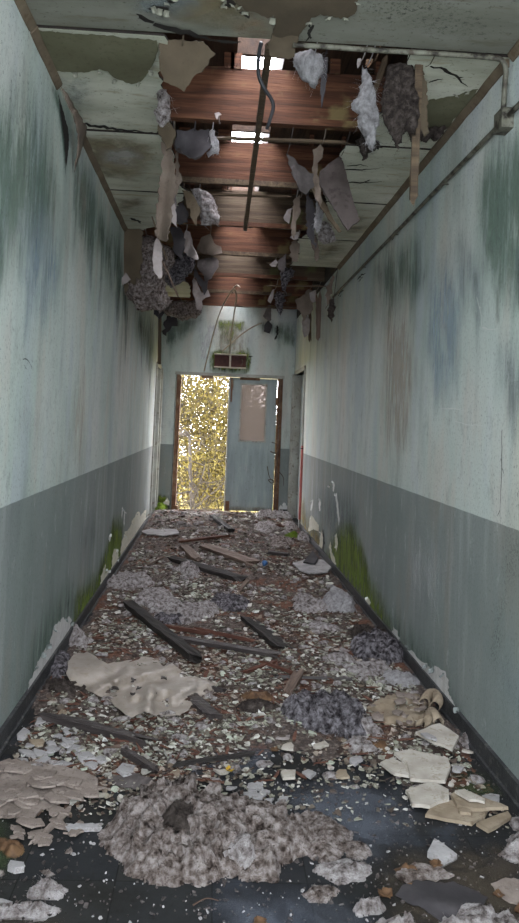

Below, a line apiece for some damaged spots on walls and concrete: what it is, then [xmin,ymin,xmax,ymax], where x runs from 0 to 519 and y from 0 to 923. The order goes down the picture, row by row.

peeling [148,0,178,17]
peeling [220,0,250,18]
crack [429,66,468,87]
leakage [0,117,49,247]
leakage [76,163,128,316]
leakage [483,145,519,285]
peeling [100,507,146,584]
peeling [28,617,74,689]
peeling [392,627,459,713]